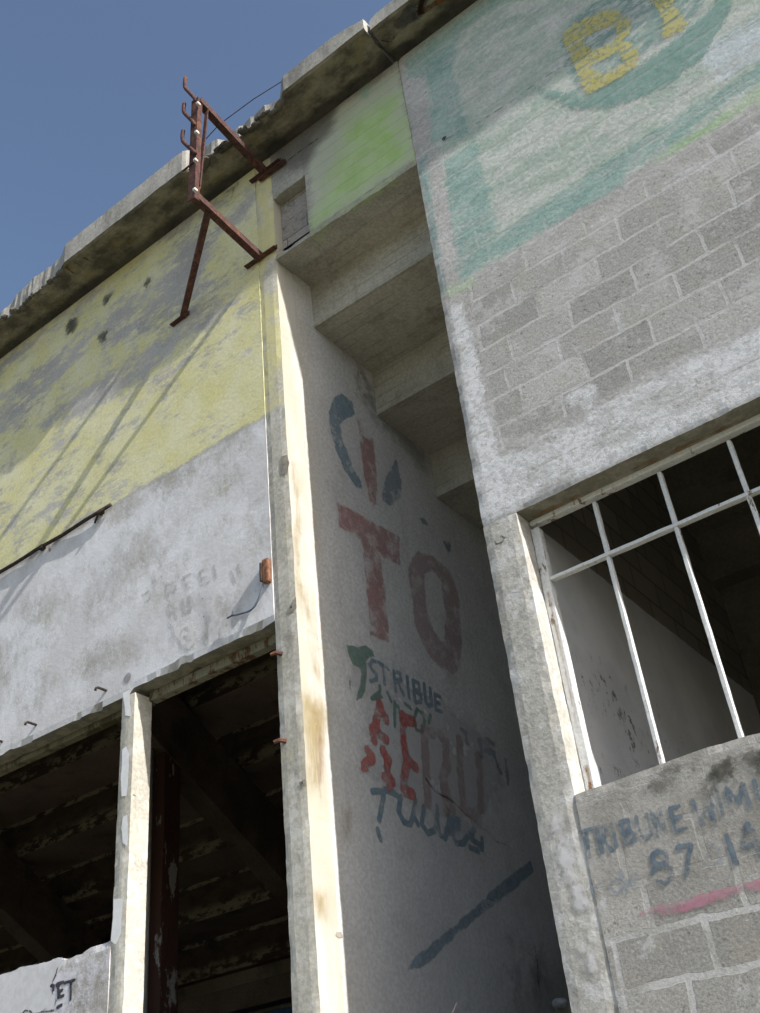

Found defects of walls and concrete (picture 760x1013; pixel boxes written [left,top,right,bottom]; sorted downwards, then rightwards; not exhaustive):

water stain [66,318,77,335]
peeling [123,690,132,716]
peeling [121,747,129,796]
peeling [111,899,123,944]
crack [22,959,64,1013]